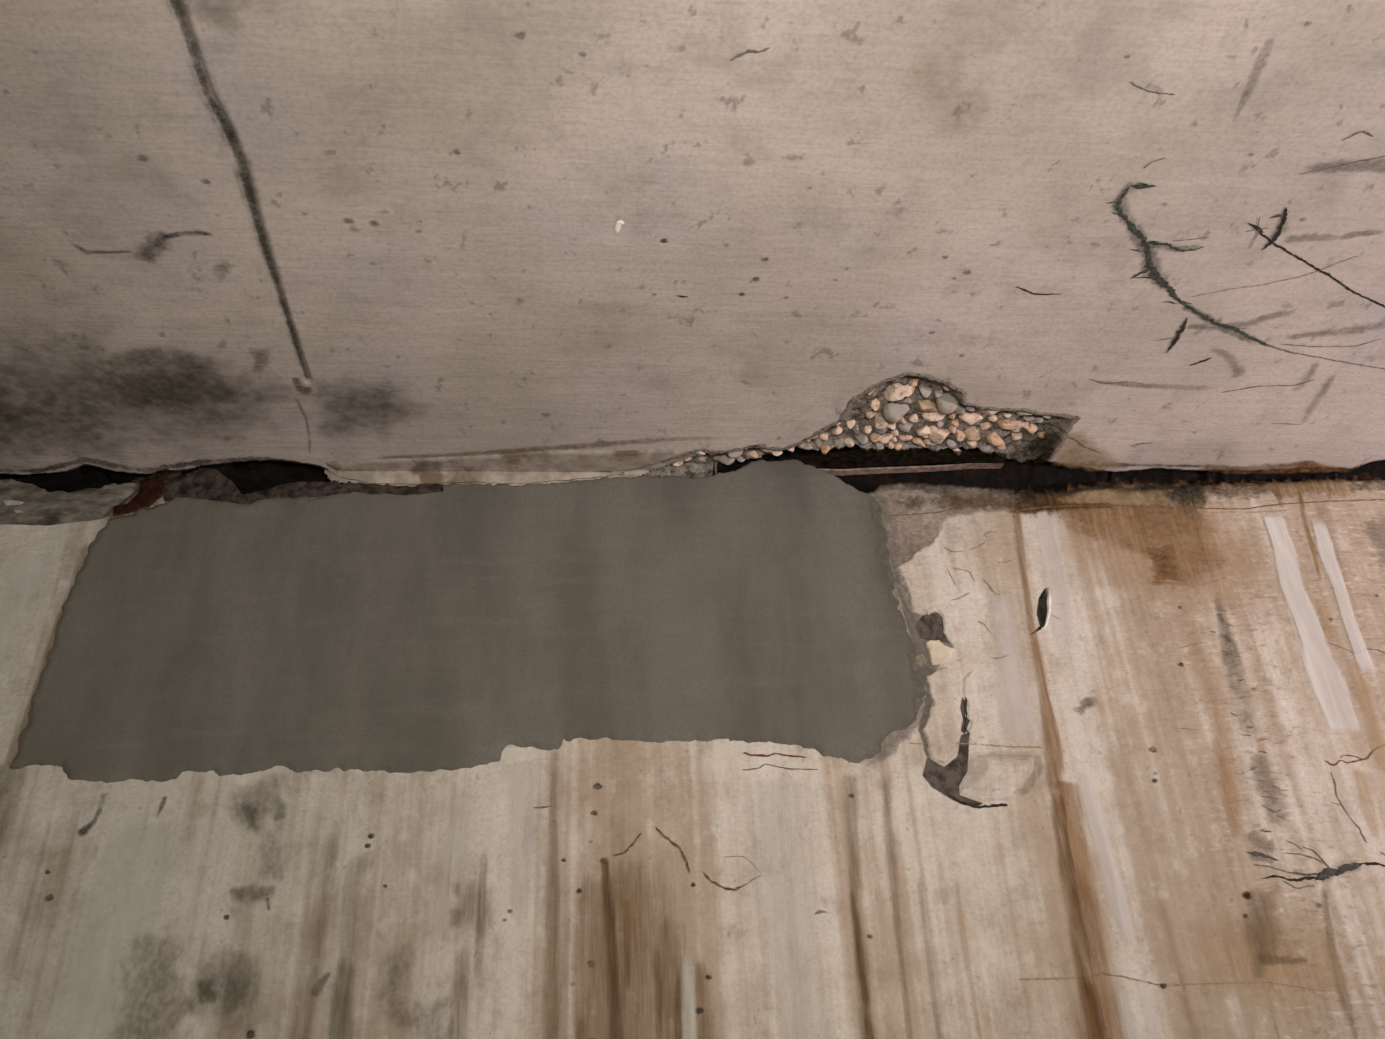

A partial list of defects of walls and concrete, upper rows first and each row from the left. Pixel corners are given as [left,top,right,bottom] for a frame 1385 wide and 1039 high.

crack [1107,158,1385,393]
spalling [0,474,179,526]
crack [0,458,624,495]
spalling [642,371,1080,478]
crack [713,436,1385,516]
corrosion [1015,442,1220,660]
corrosion [1205,461,1347,505]
peeling [870,484,1011,806]
corrosion [603,861,641,1004]
crack [613,827,762,891]
corrosion [1042,683,1113,1039]
crack [1248,744,1385,889]